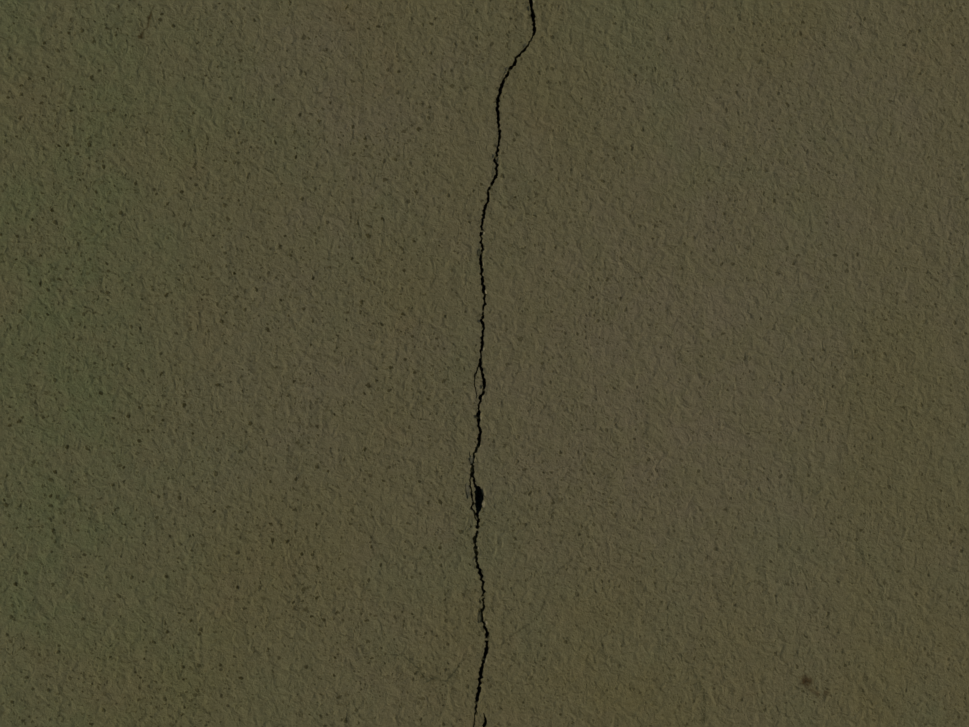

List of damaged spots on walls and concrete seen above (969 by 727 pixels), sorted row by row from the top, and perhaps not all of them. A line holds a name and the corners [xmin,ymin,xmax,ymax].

crack [466,0,536,727]